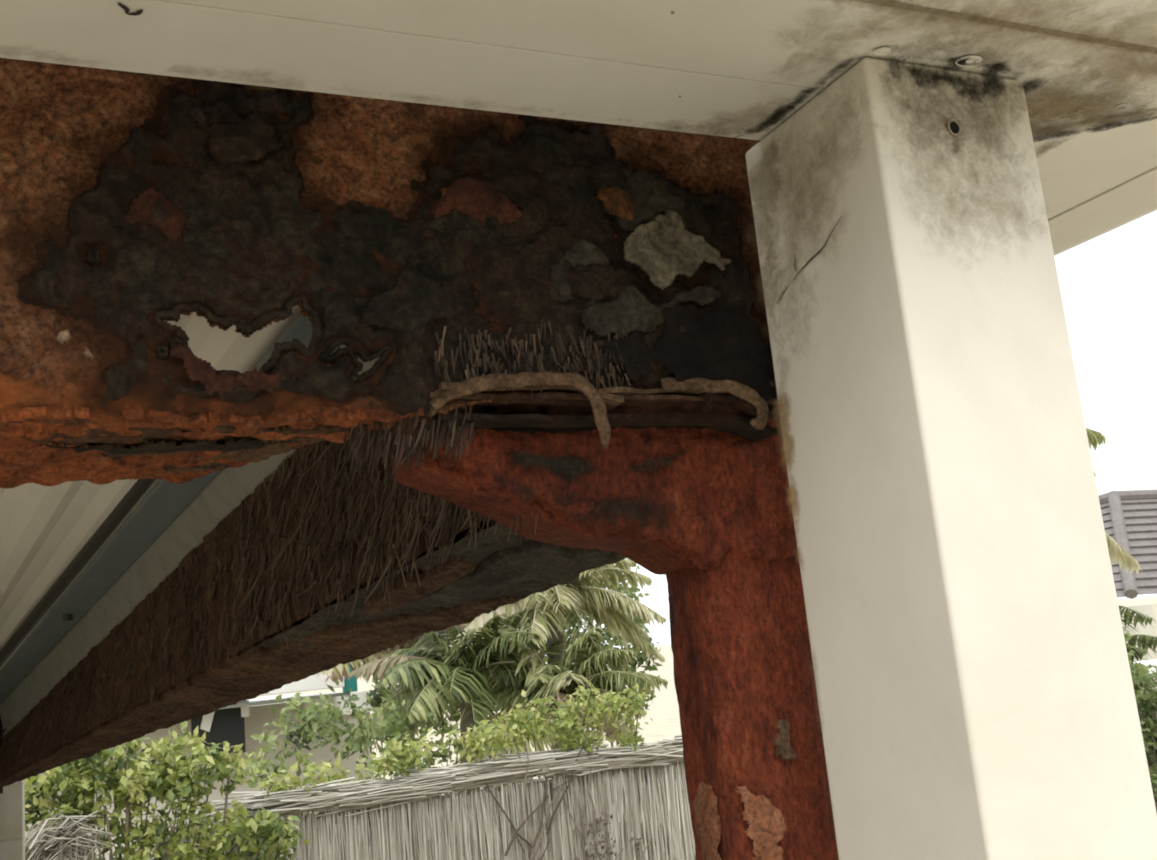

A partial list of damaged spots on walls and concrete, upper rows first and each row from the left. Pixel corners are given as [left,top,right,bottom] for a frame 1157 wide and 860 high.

damp [738,59,853,137]
damp [890,49,1157,154]
spalling [56,329,72,345]
corrosion [4,77,792,484]
spalling [581,170,777,430]
corrosion [773,719,796,761]
corrosion [693,781,721,860]
corrosion [736,786,787,860]